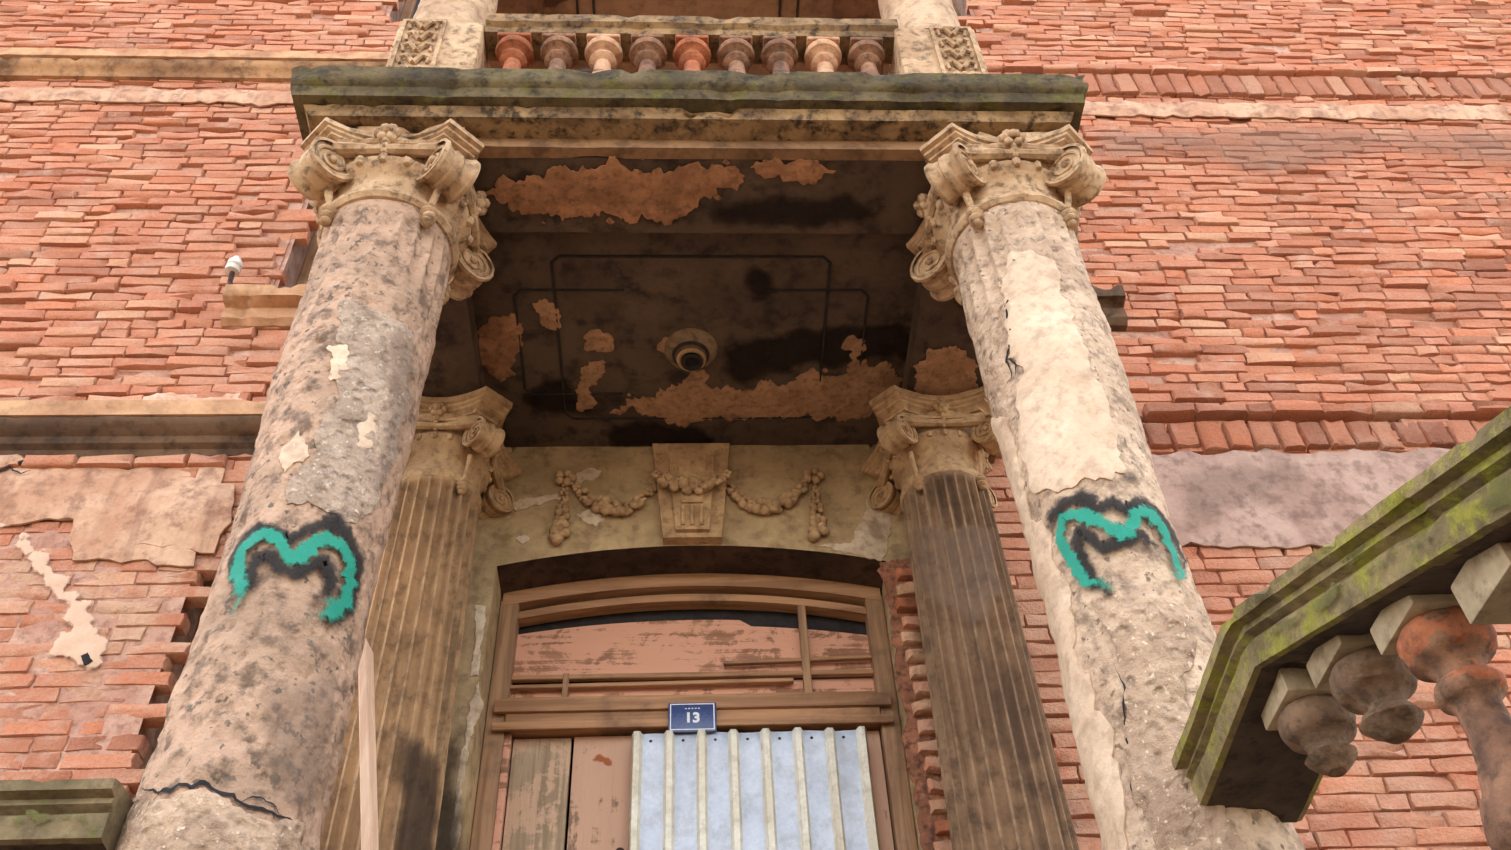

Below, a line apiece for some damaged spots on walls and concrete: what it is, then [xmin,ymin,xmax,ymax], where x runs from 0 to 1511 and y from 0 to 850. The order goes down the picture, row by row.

peeling [485,156,836,226]
peeling [477,299,562,382]
flaking render [279,299,414,524]
peeling [575,329,979,428]
crack [0,454,30,474]
flaking render [0,454,228,470]
flaking render [512,468,602,512]
flaking render [577,509,605,526]
flaking render [990,250,1248,850]
flaking render [815,499,952,850]
crack [141,780,303,822]